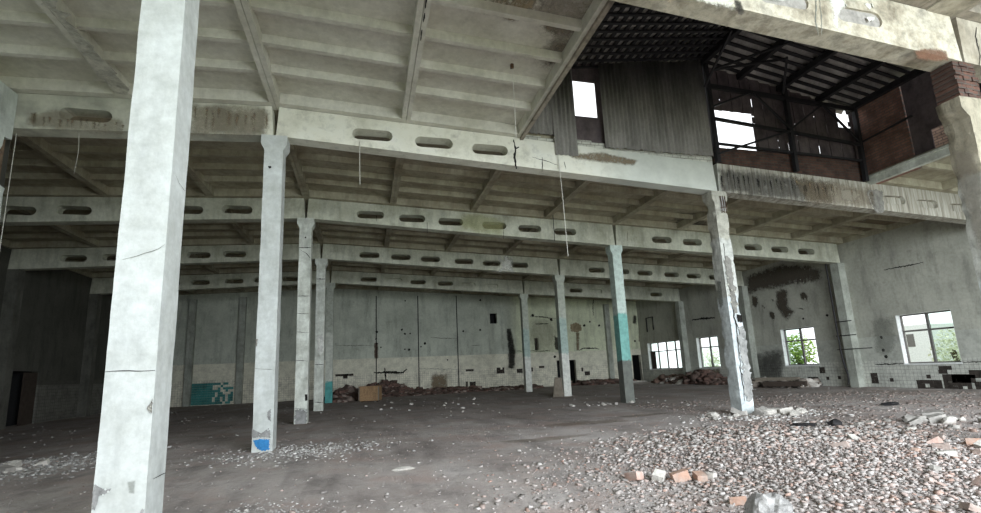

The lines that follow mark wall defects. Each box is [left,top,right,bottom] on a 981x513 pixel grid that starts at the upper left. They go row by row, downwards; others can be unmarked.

peeling [830,0,847,27]